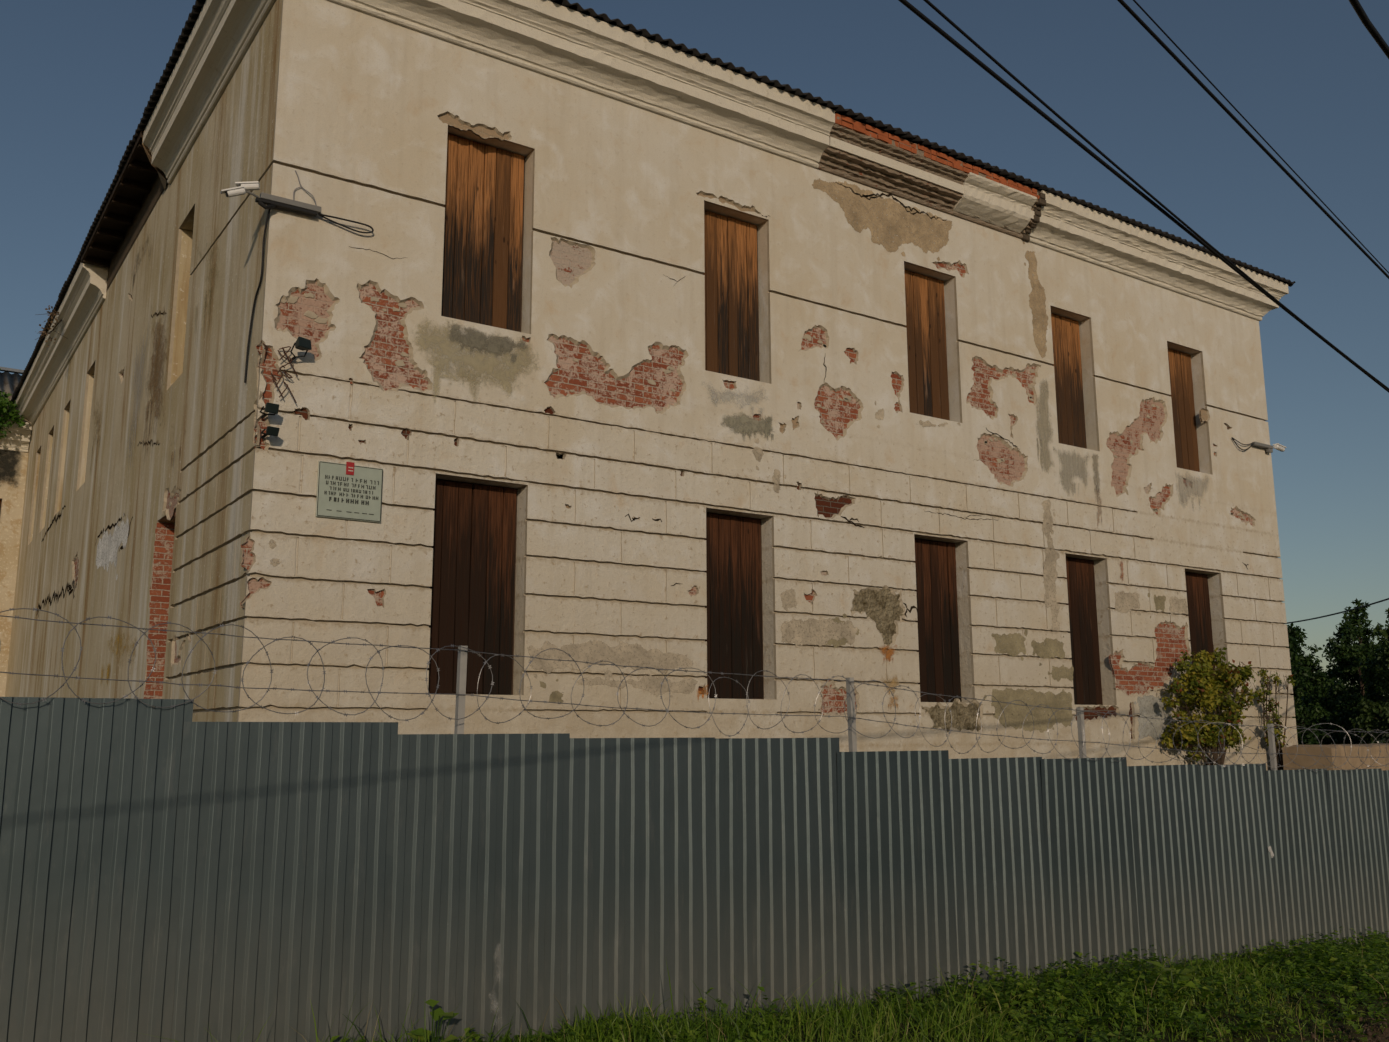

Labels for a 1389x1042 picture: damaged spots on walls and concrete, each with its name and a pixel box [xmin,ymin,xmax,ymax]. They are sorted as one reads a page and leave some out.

flaking render [549,237,595,288]
peeling [812,178,968,278]
flaking render [253,278,340,452]
flaking render [357,280,432,392]
water stain [416,324,531,396]
flaking render [522,334,689,415]
flaking render [779,371,904,440]
flaking render [966,241,1048,487]
flaking render [753,438,856,519]
flaking render [1106,397,1193,517]
flaking render [921,499,1192,741]